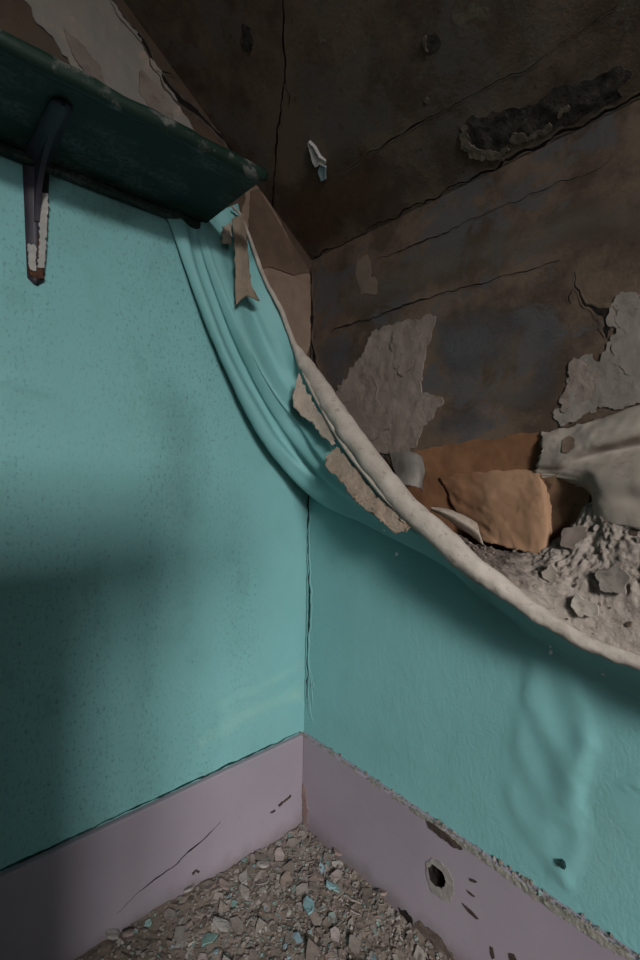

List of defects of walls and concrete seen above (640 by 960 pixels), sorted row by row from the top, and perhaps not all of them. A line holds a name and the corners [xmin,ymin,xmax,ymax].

peeling [23,0,196,132]
crack [270,0,292,208]
peeling [307,140,327,182]
crack [310,90,640,372]
spalling [459,65,633,161]
flaking render [336,314,444,454]
flaking render [553,292,640,427]
crack [305,494,315,726]
crack [116,821,221,915]
spalling [299,732,640,960]